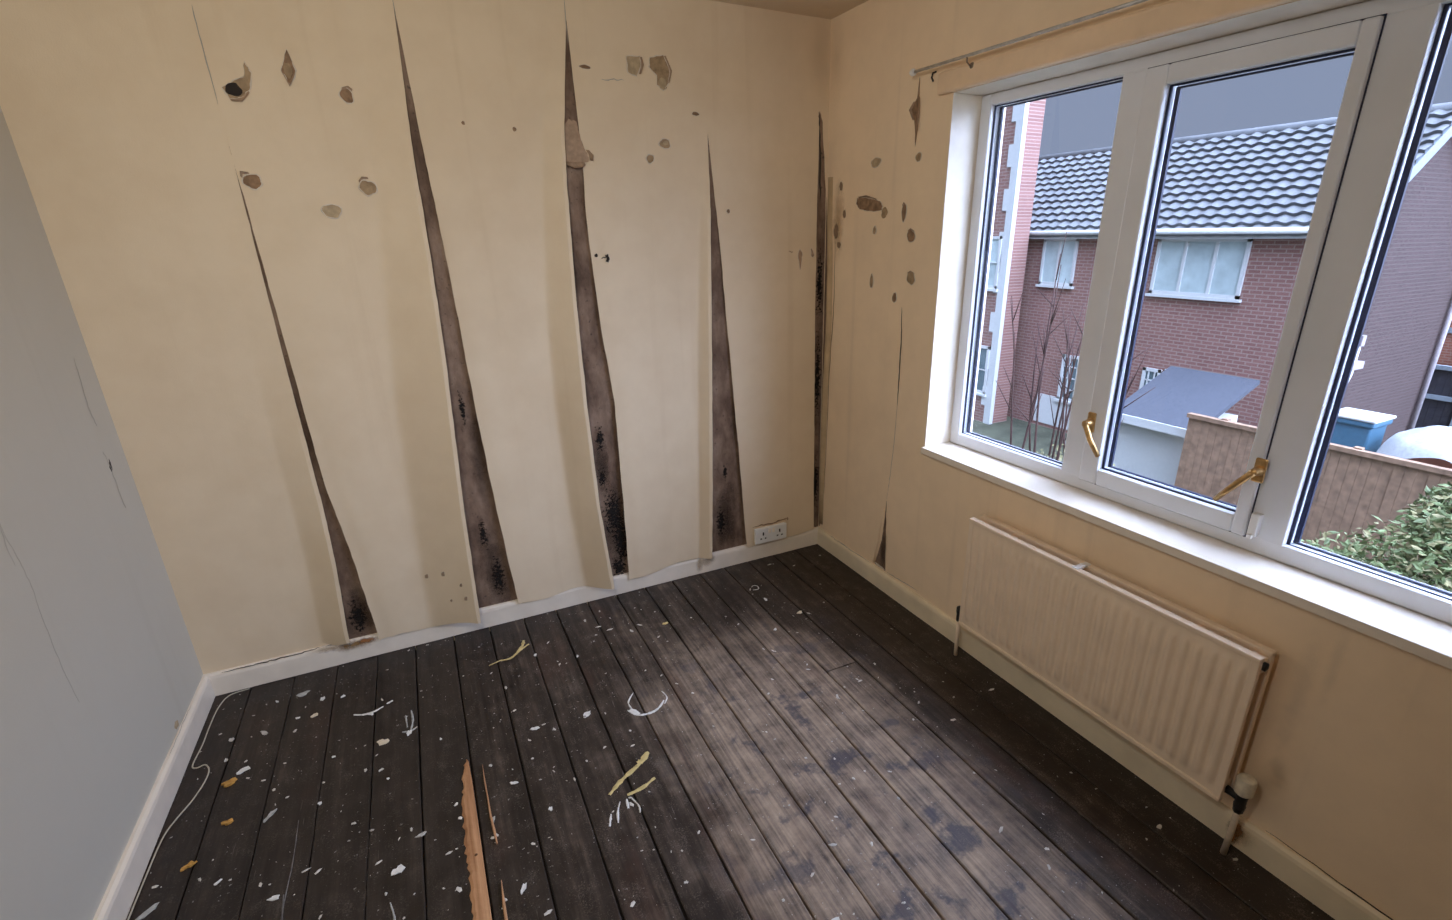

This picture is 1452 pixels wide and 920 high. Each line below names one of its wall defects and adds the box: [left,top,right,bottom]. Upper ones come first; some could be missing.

peeling [192,7,252,103]
peeling [280,49,297,86]
peeling [338,86,354,104]
flaking render [564,1,579,131]
peeling [626,55,672,91]
peeling [856,195,916,242]
flaking render [235,169,378,639]
flaking render [392,0,517,608]
flaking render [566,150,629,576]
flaking render [708,141,747,552]
peeling [892,271,915,303]